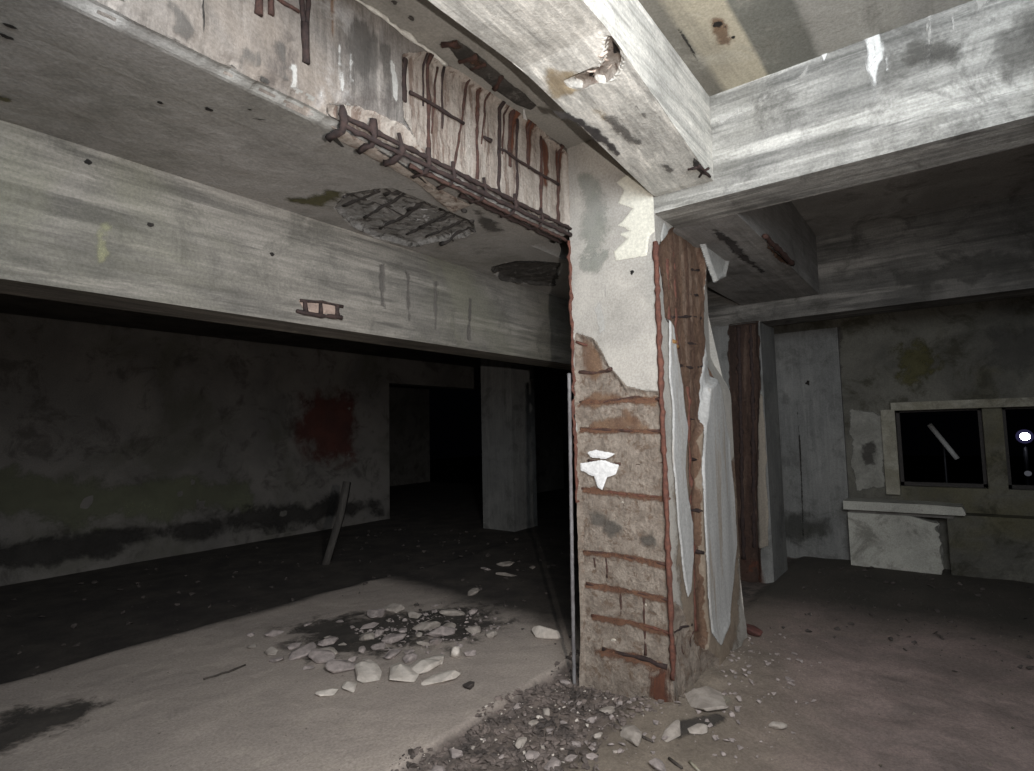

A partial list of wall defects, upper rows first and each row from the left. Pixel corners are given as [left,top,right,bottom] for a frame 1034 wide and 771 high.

corrosion [713,18,731,44]
spalling [296,299,344,320]
spalling [325,36,769,704]